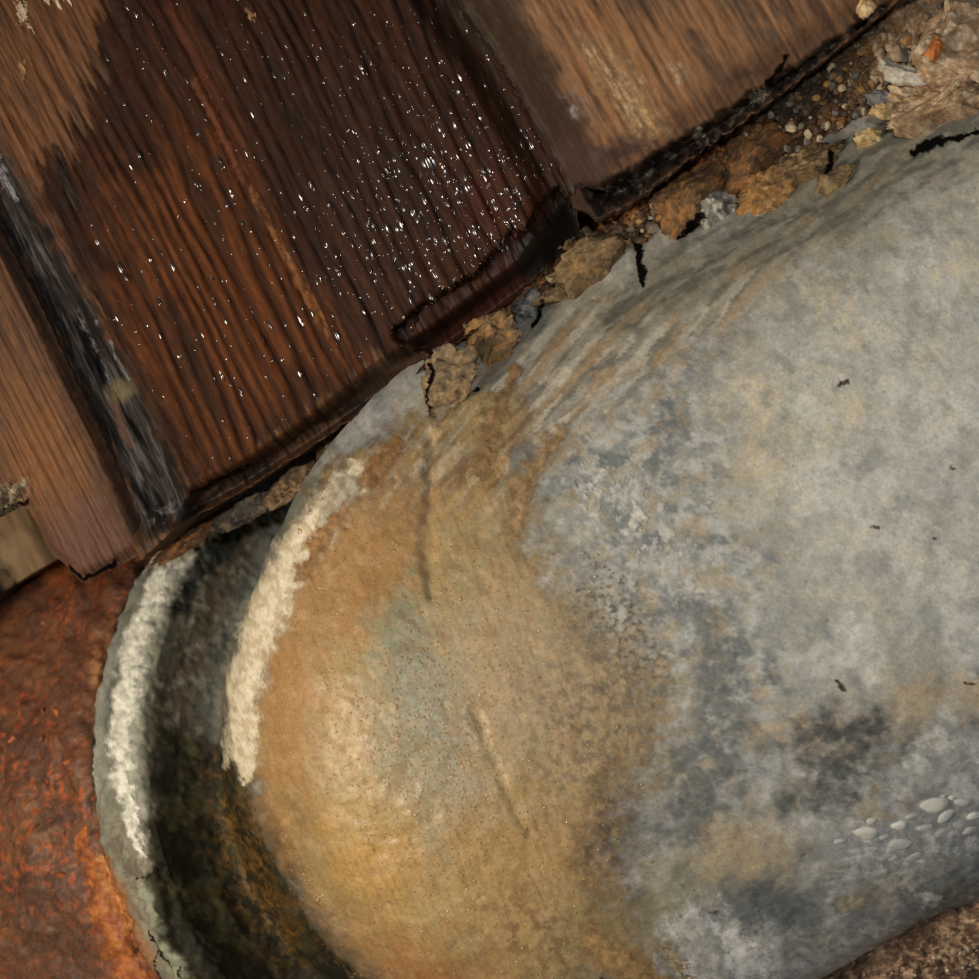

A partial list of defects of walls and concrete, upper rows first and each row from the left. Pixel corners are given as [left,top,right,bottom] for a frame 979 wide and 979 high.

spalling [862,85,924,120]
spalling [923,35,943,64]
water stain [0,157,18,202]
water stain [36,0,568,498]
corrosion [88,649,103,687]
water stain [94,529,240,859]
corrosion [233,364,696,979]
water stain [777,707,889,819]
corrosion [74,826,155,979]
water stain [659,809,979,979]